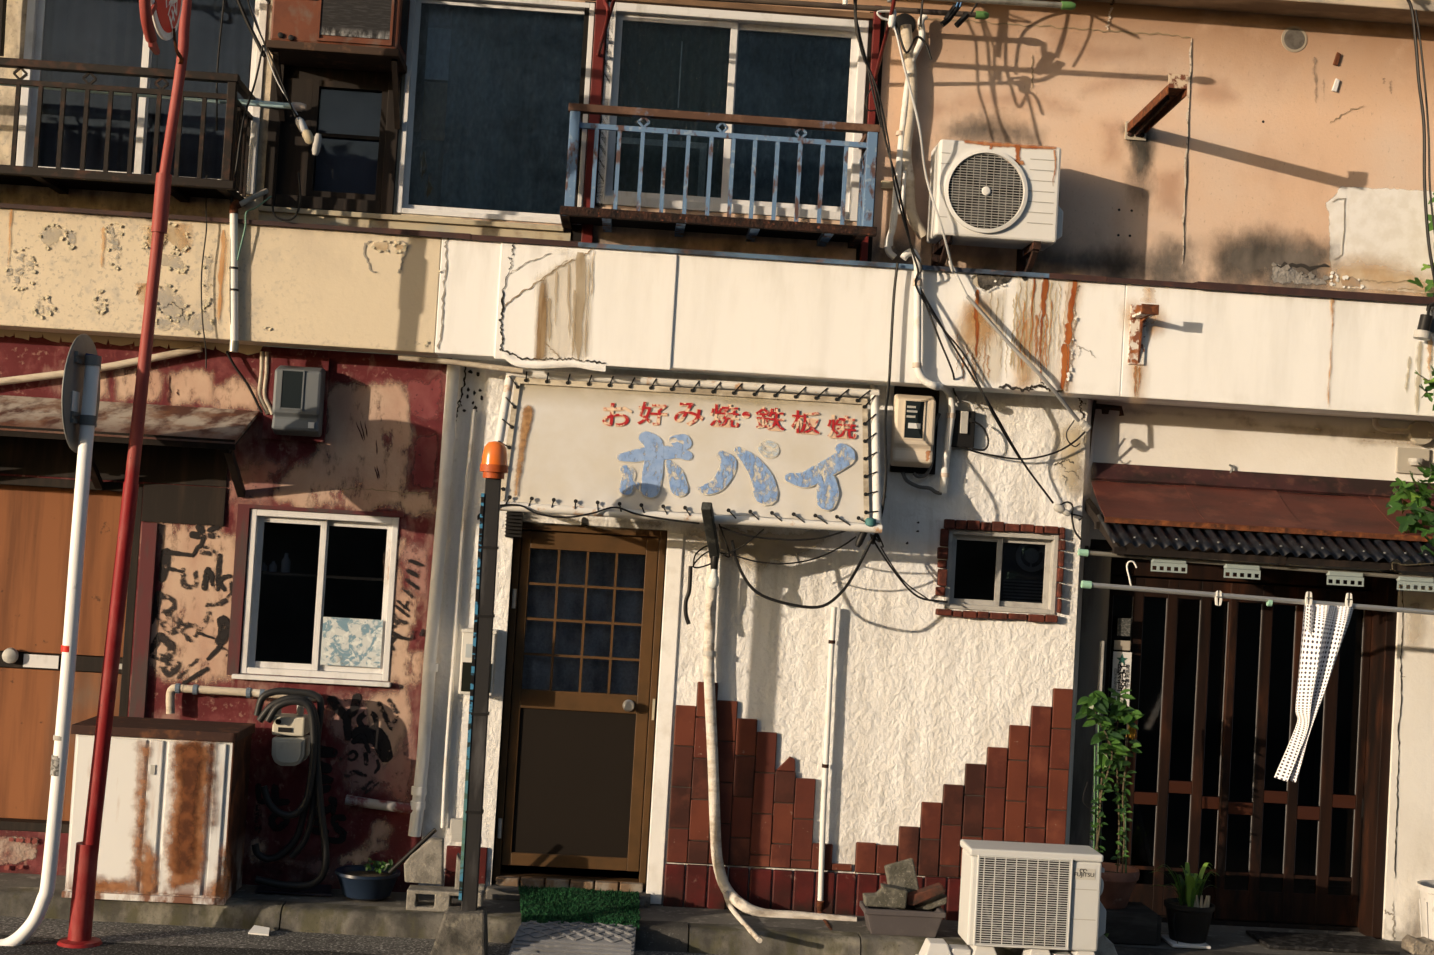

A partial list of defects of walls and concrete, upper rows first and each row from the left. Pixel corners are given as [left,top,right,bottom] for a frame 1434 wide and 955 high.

leakage [1129,130,1152,174]
peeling [0,222,271,355]
peeling [100,368,259,411]
peeling [228,376,443,517]
crack [437,238,466,421]
crack [499,243,605,364]
corrosion [956,289,990,382]
corrosion [1010,277,1077,390]
leakage [1219,235,1426,293]
peeling [149,522,236,684]
peeling [331,540,427,803]
peeling [307,820,390,880]